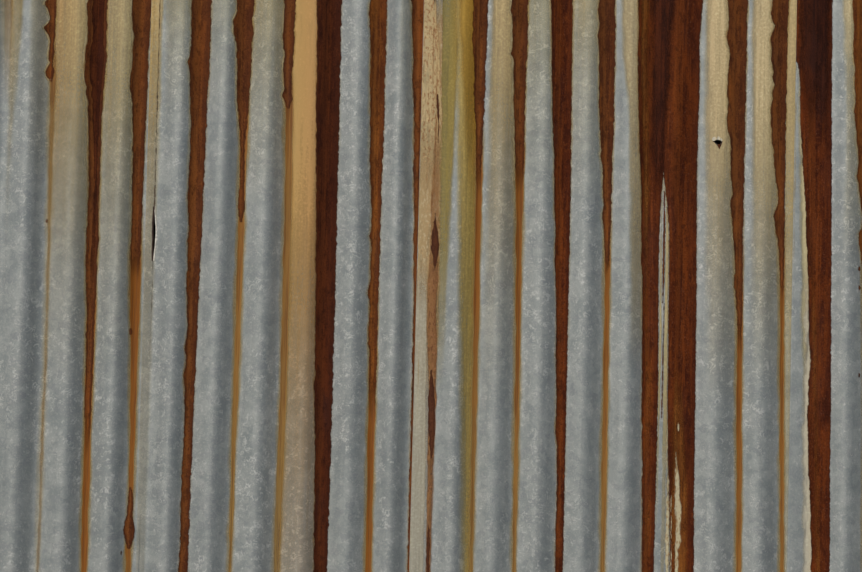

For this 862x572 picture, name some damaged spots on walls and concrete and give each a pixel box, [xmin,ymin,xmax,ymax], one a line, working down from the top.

corrosion [81,0,108,572]
corrosion [121,0,151,572]
corrosion [178,0,212,572]
corrosion [228,0,255,572]
corrosion [274,0,342,572]
corrosion [365,0,387,572]
corrosion [469,0,489,572]
corrosion [550,0,573,572]
corrosion [637,0,703,572]
corrosion [718,0,748,572]
corrosion [769,0,833,572]
corrosion [852,0,862,210]